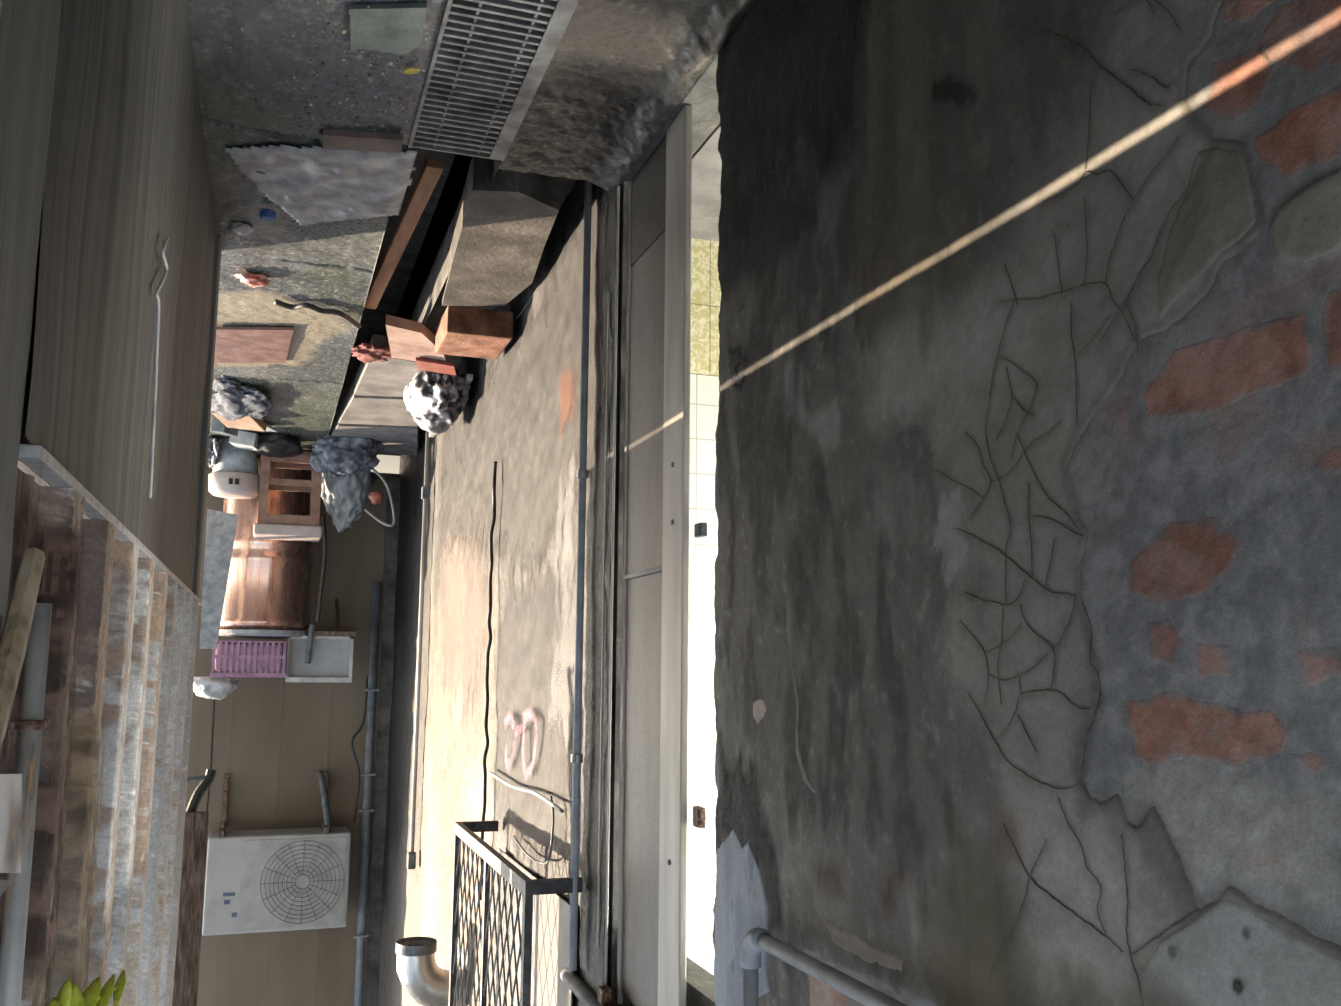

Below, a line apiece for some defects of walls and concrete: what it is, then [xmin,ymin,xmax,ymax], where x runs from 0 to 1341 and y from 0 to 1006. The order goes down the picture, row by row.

crack [938,27,1216,1006]
spalling [1067,0,1341,946]